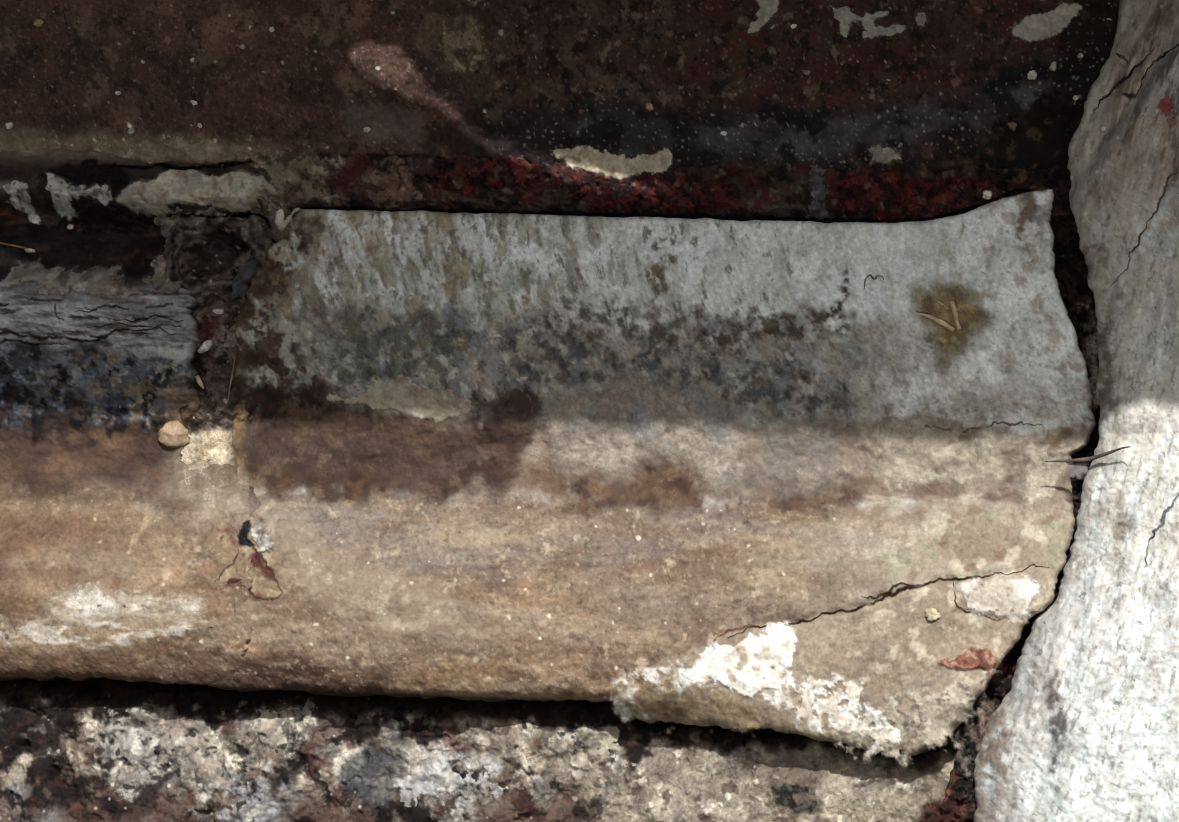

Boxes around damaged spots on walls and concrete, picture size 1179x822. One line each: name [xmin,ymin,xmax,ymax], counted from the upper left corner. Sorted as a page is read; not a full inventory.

crack [1093,43,1179,113]
crack [1110,172,1179,287]
water stain [229,223,856,504]
crack [714,564,1049,640]
spalling [546,622,974,794]
corrosion [918,797,969,822]